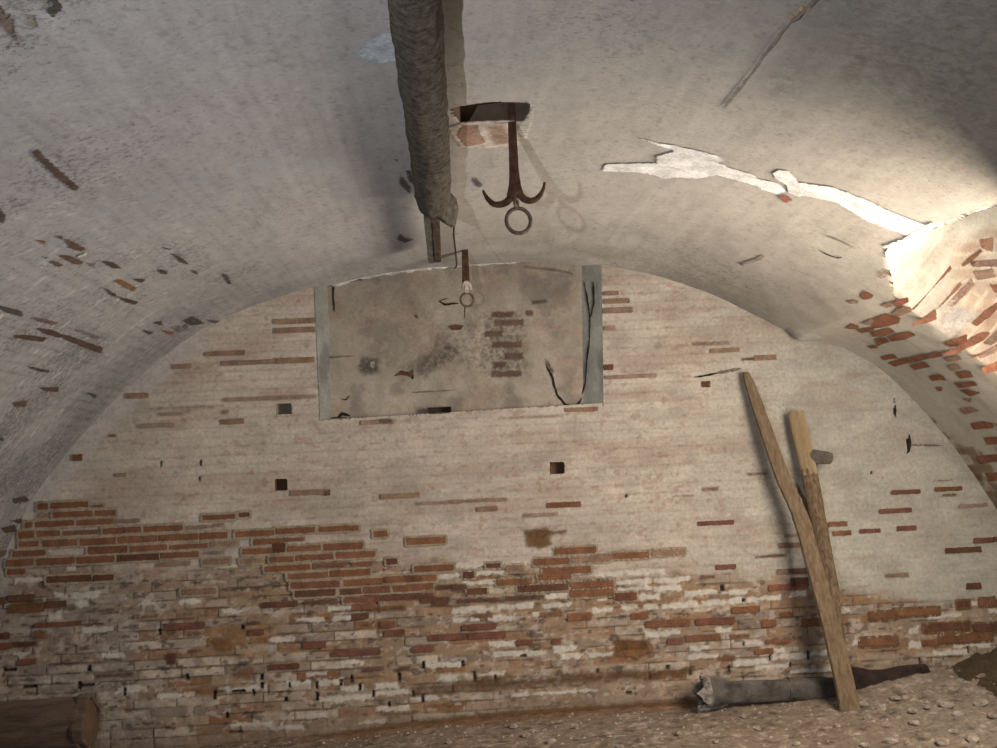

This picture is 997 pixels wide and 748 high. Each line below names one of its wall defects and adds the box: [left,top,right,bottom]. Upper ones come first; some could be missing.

crack [723,0,819,108]
spalling [32,149,78,191]
spalling [37,236,145,304]
spalling [0,305,103,353]
crack [327,262,595,405]
spalling [846,238,997,482]
peeling [0,496,821,655]
peeling [828,521,881,536]
peeling [945,537,997,554]
peeling [868,582,997,646]
damp [412,669,689,695]
damp [313,700,698,737]